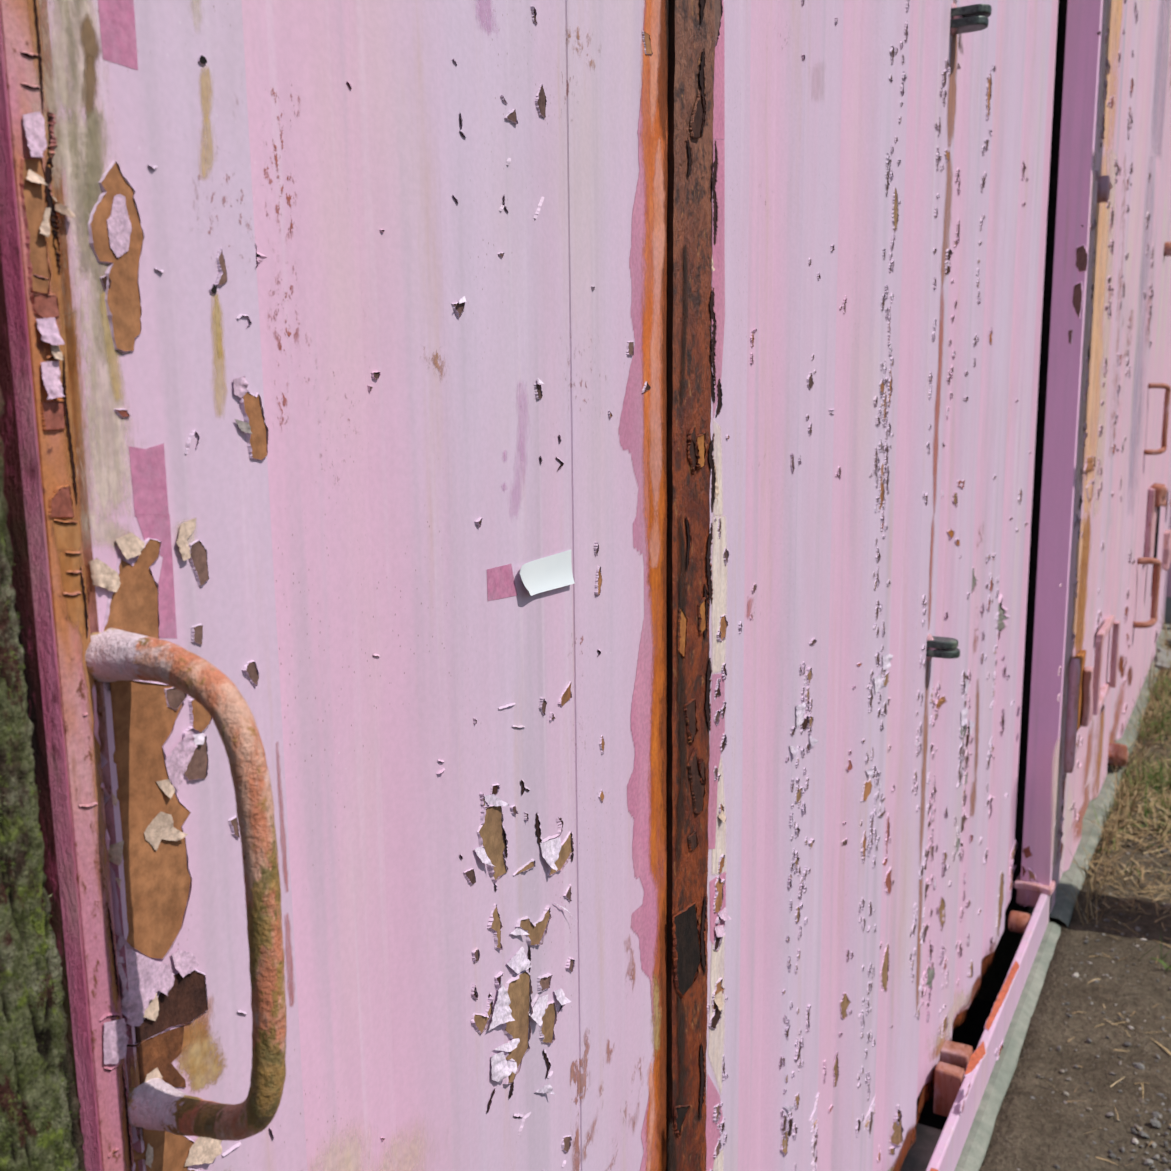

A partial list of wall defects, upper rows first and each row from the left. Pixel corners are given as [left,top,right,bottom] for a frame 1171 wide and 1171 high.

peeling [19,111,78,519]
corrosion [28,0,111,866]
peeling [88,160,144,418]
peeling [89,532,161,639]
peeling [92,680,212,1094]
corrosion [179,1004,225,1090]
peeling [460,779,575,1113]
corrosion [625,0,719,1171]
peeling [852,0,910,731]
corrosion [923,34,962,629]
corrosion [1051,657,1133,862]
corrosion [1058,0,1152,676]